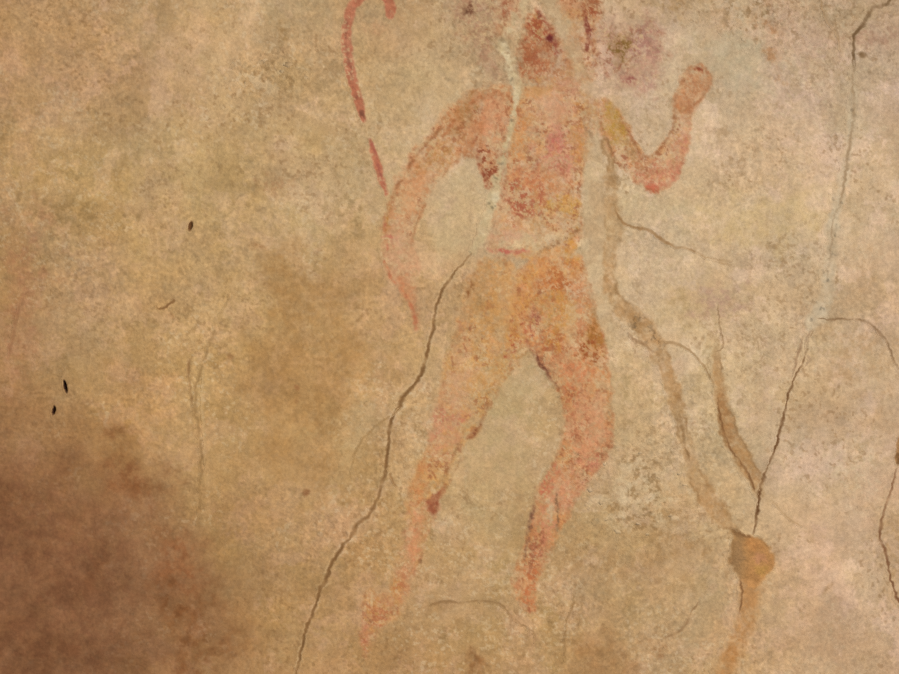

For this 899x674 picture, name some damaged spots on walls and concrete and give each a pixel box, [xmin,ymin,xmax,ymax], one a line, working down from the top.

crack [292,0,899,674]
water stain [545,607,654,674]